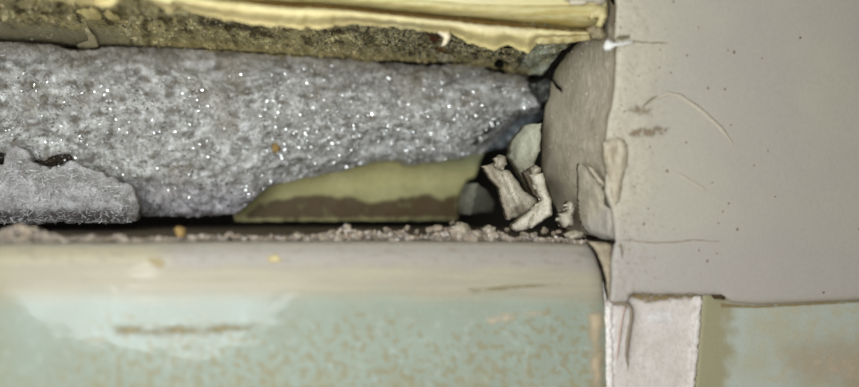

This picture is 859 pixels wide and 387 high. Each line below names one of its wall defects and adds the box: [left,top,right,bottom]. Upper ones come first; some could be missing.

peeling [64,0,121,50]
peeling [147,0,608,77]